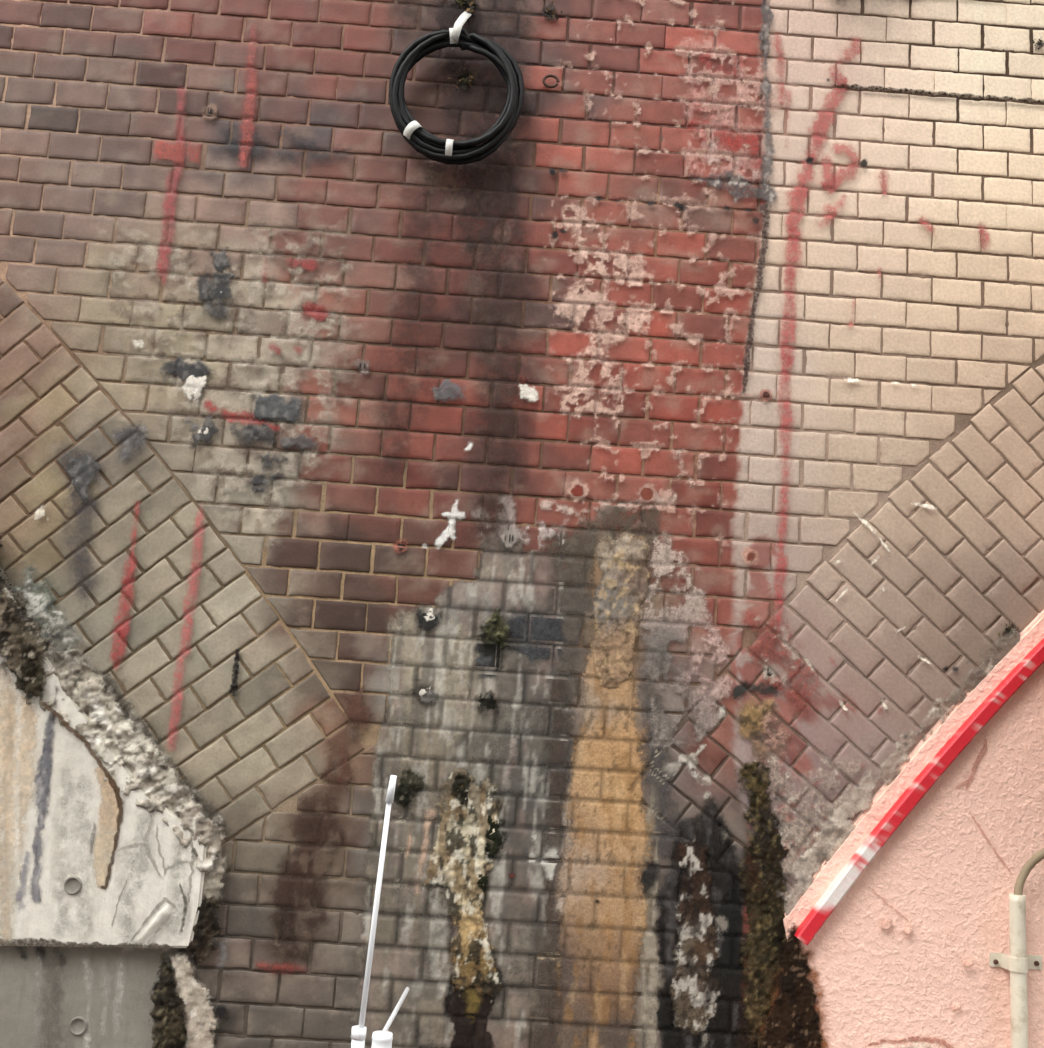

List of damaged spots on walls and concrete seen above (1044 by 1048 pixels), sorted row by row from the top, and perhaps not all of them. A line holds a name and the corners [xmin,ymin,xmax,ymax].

water stain [225,27,341,167]
water stain [684,34,790,178]
crack [833,84,1044,104]
crack [648,201,687,211]
crack [697,0,777,393]
peeling [686,234,750,341]
peeling [646,361,749,439]
water stain [269,105,828,1048]
flaking render [11,565,226,901]
corrosion [529,530,653,1048]
flaking render [169,953,218,1048]
crack [867,1036,953,1048]